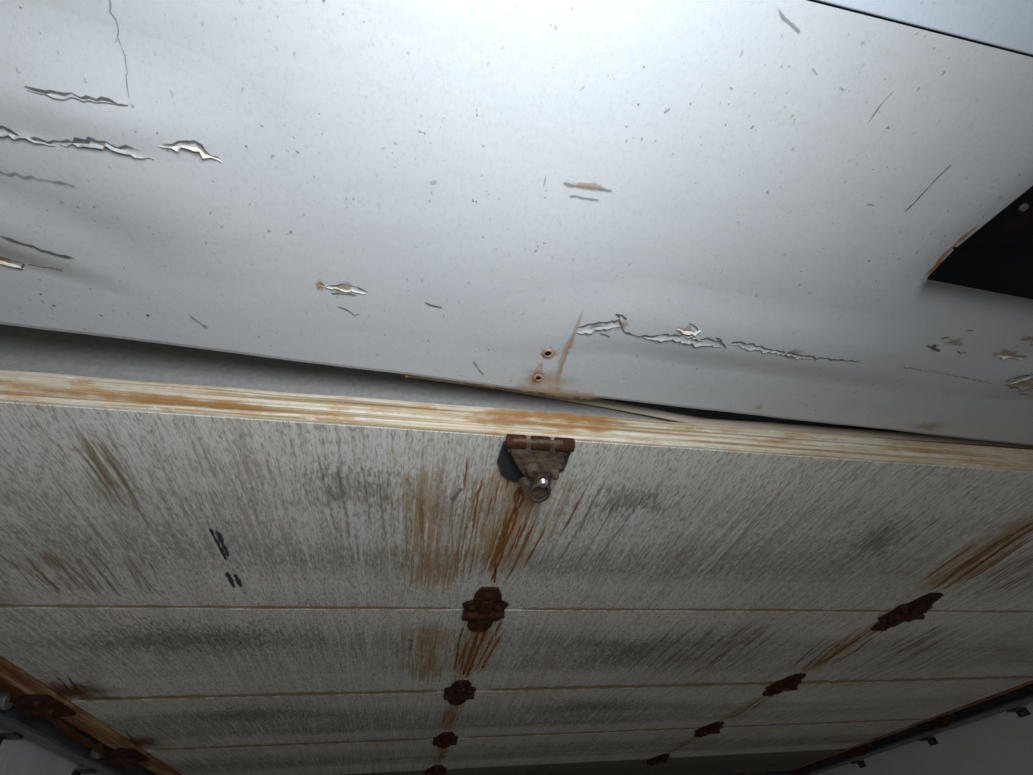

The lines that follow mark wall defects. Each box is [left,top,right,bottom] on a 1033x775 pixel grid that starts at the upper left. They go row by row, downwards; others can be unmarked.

crack [24,0,129,106]
peeling [0,125,154,160]
peeling [159,140,223,163]
spalling [0,236,72,271]
peeling [316,282,367,316]
peeling [575,314,727,348]
crack [729,341,858,362]
rust [473,479,544,583]
rust [924,522,1033,590]
rust [445,621,502,678]
rust [796,630,1033,685]
rust [491,682,775,691]